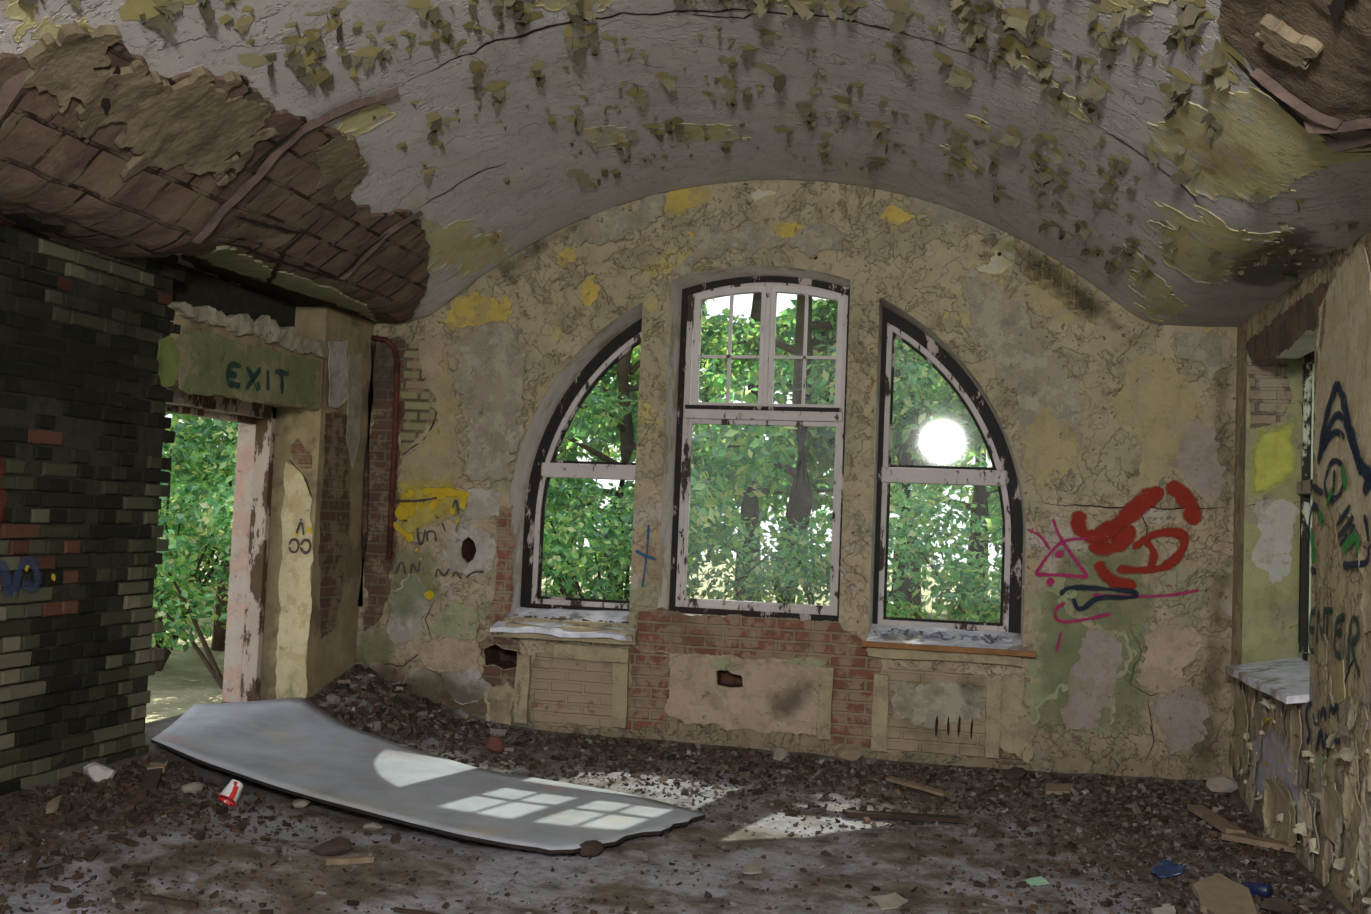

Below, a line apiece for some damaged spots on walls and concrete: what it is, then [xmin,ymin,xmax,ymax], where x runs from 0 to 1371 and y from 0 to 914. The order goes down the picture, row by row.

crack [399,8,1013,87]
crack [1095,124,1204,208]
flaking render [119,0,1371,633]
flaking render [625,576,1210,763]
flaking render [1228,634,1371,914]
spalling [1151,905,1176,914]